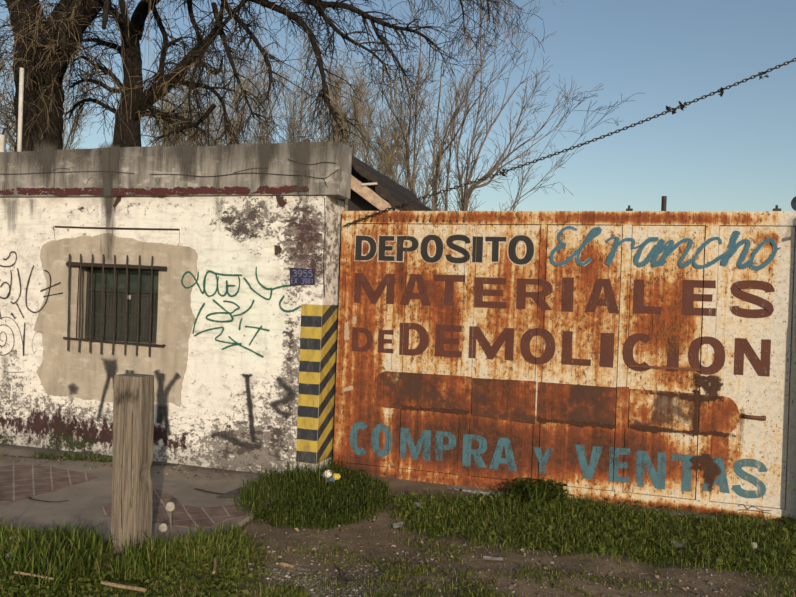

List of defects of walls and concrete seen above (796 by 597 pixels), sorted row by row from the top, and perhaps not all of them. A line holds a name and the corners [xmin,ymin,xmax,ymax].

peeling [0,187,102,196]
water stain [99,143,119,258]
water stain [176,142,196,179]
peeling [112,185,323,277]
water stain [258,139,273,182]
flaking render [0,233,198,453]